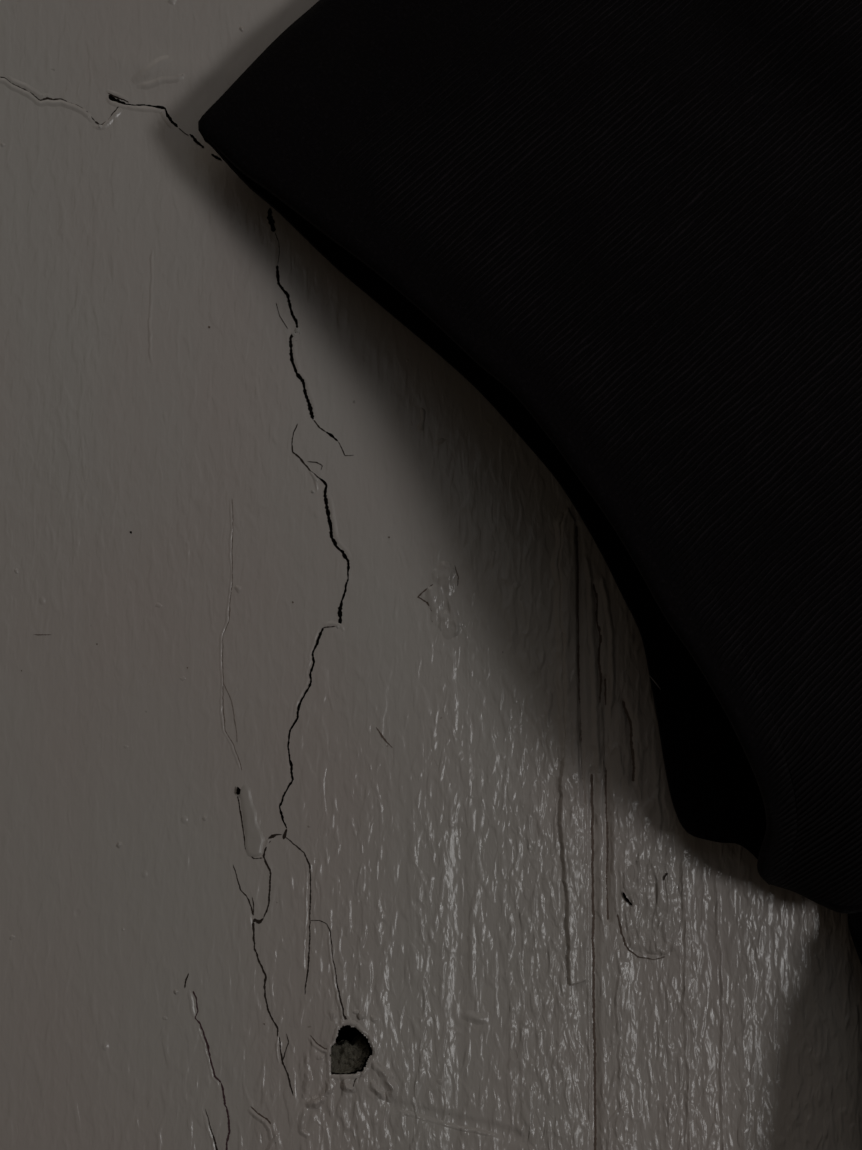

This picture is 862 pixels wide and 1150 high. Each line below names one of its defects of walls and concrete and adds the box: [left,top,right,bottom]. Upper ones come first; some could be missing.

crack [0,75,222,161]
crack [219,208,353,1094]
crack [184,973,276,1150]
spalling [331,1010,378,1074]